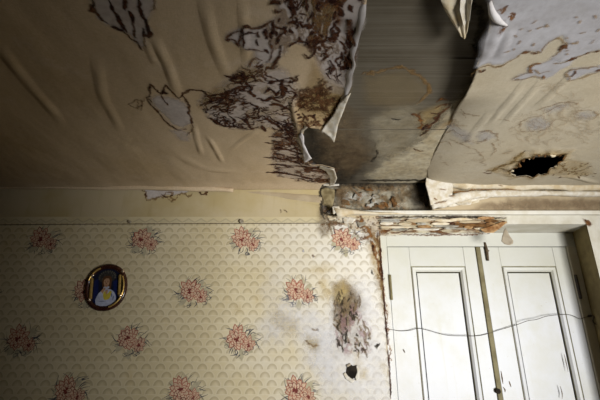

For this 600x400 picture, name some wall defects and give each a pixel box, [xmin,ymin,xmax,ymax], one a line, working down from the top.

peeling [441,0,473,39]
damp [129,0,462,257]
peeling [320,183,507,236]
spalling [343,363,359,383]